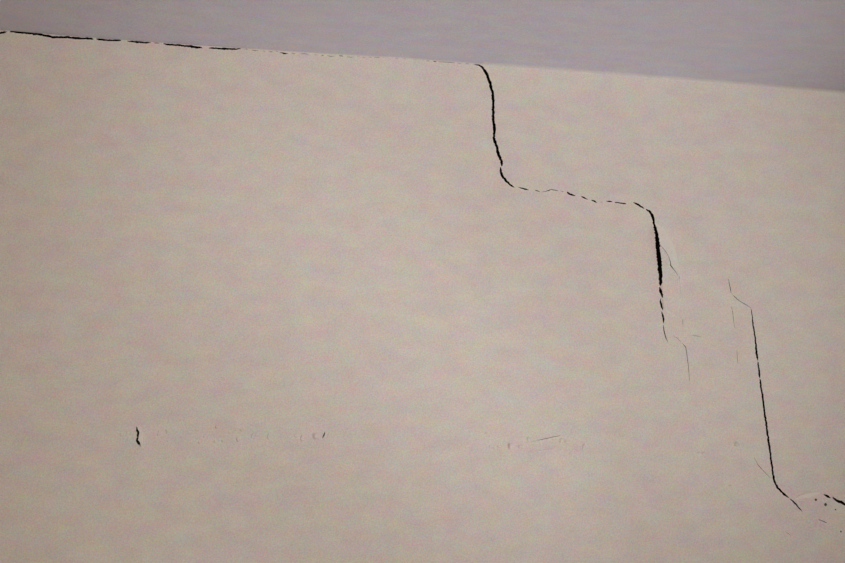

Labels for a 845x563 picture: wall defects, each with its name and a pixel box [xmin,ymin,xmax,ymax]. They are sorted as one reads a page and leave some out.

crack [0,31,258,51]
crack [433,61,700,381]
crack [728,279,802,511]